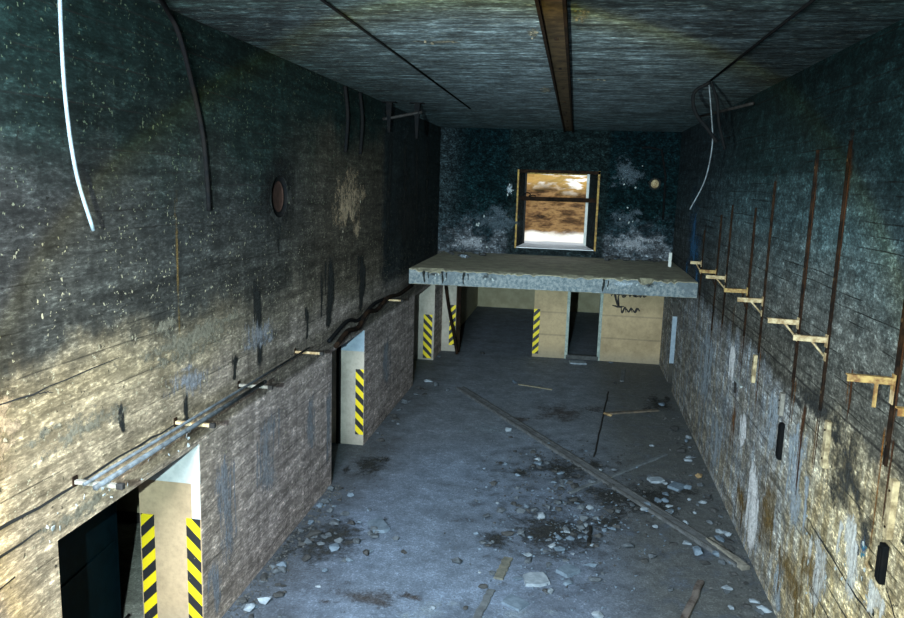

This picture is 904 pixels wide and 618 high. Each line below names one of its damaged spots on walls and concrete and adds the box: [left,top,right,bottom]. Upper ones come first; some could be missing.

corrosion [870,340,904,544]